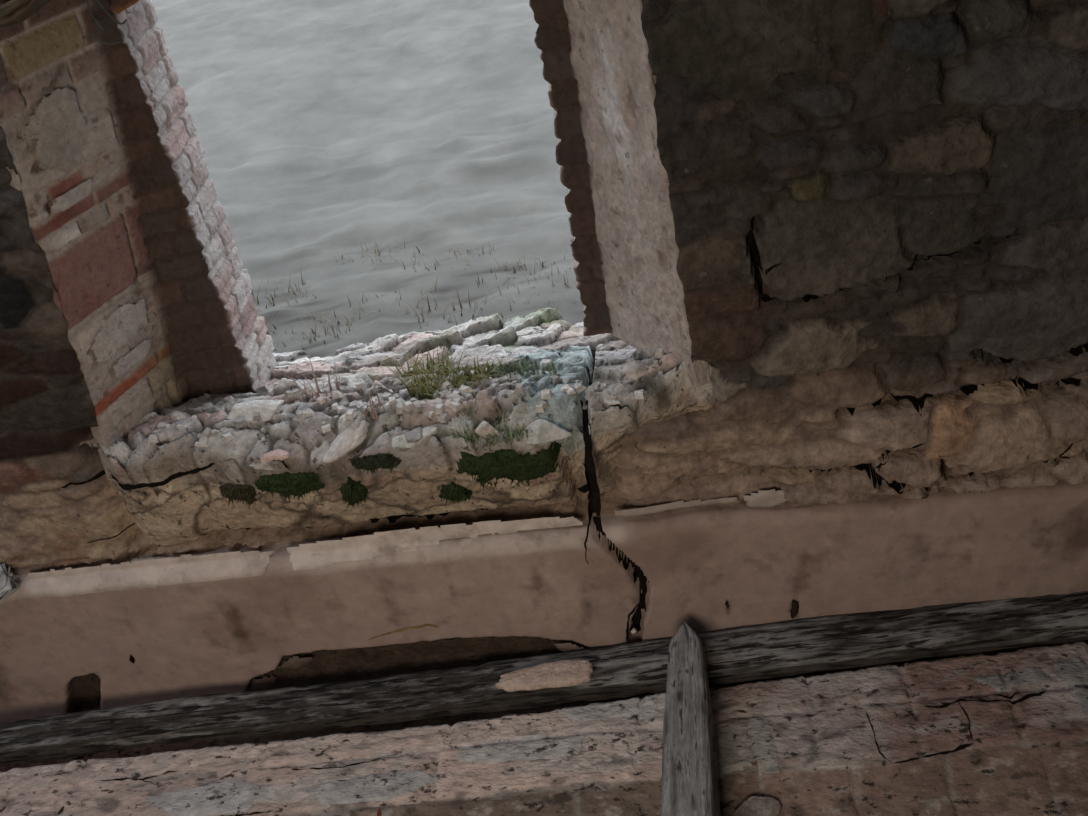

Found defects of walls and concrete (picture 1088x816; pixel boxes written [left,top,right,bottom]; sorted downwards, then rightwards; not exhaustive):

crack [577,347,649,642]
spalling [247,636,590,691]
crack [866,691,1045,764]
crack [292,754,407,781]
crack [221,808,271,816]